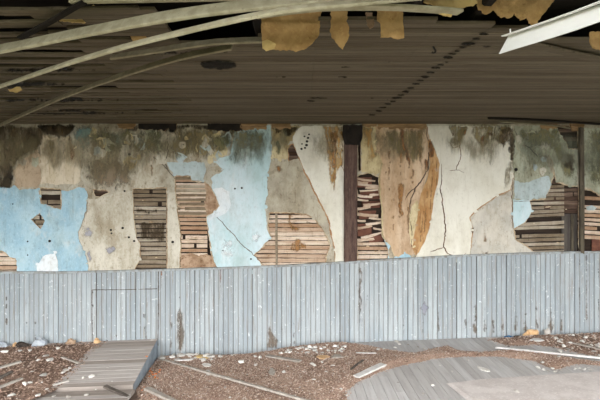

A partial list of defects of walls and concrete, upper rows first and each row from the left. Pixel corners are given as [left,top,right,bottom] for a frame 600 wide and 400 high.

water stain [201,61,236,70]
water stain [0,124,265,190]
peeling [0,125,344,274]
crack [405,132,465,255]
peeling [357,125,600,262]
water stain [449,125,578,182]